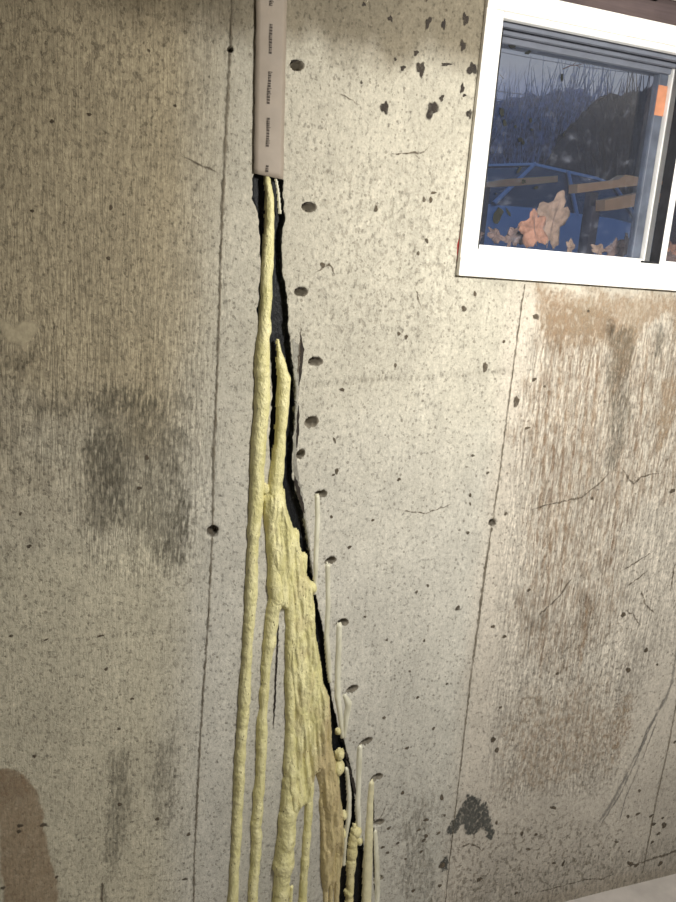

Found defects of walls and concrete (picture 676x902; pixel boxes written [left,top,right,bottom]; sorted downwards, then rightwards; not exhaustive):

crack [252,174,385,902]
leakage [447,794,495,840]